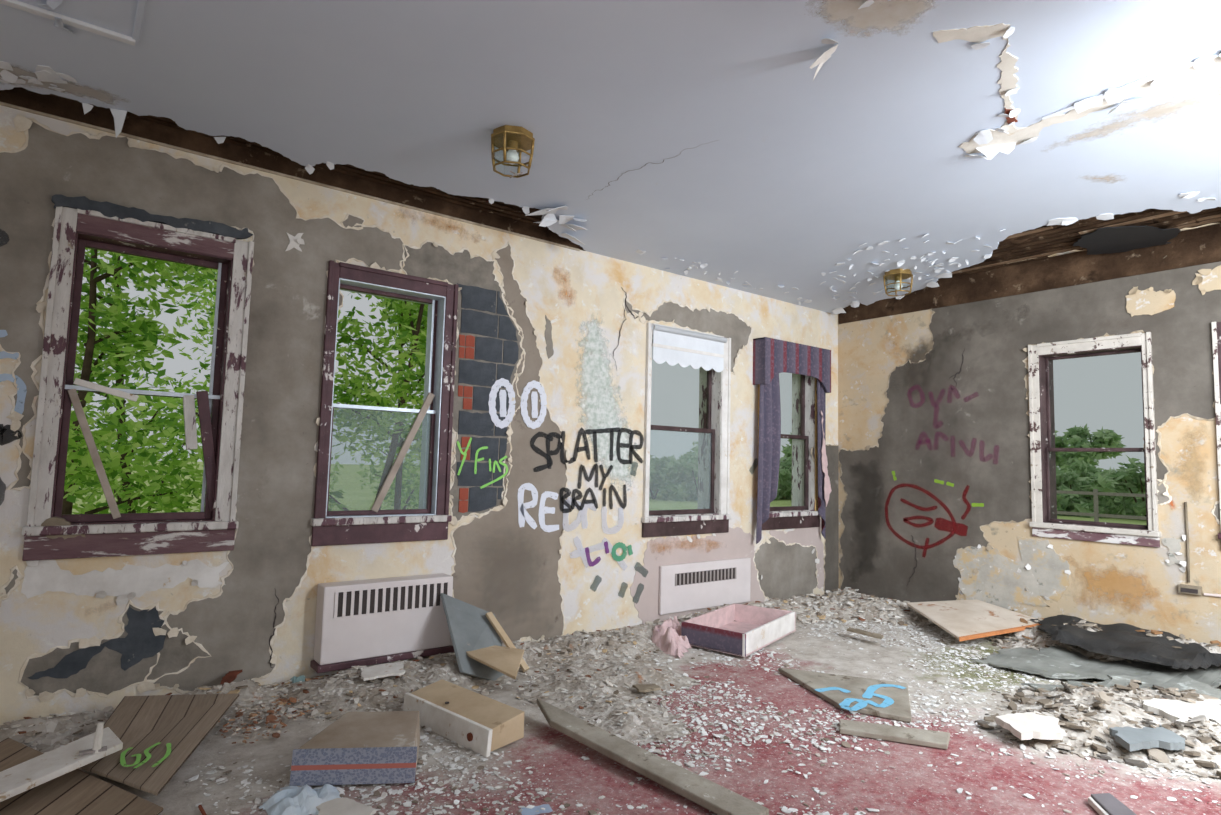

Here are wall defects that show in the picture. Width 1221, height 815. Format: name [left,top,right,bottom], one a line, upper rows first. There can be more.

peeling [0,61,76,92]
peeling [933,23,1221,160]
peeling [522,206,587,245]
peeling [1047,218,1078,226]
peeling [821,234,992,315]
spalling [0,108,571,702]
spalling [622,255,1221,624]